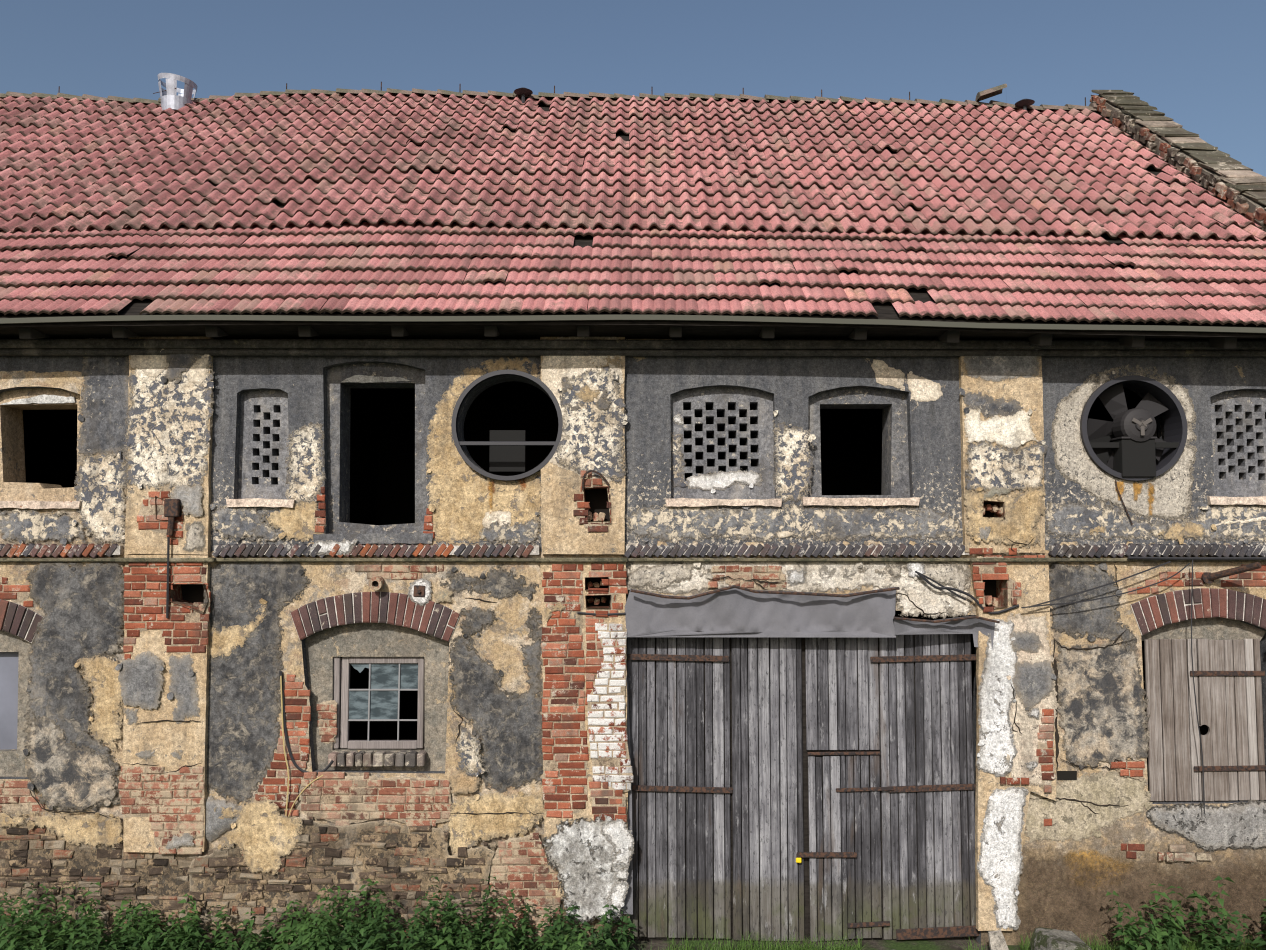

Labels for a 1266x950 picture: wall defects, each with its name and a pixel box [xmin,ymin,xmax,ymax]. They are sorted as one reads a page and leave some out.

corrosion [1116,482,1154,515]
flaking render [0,337,1266,947]
crack [1011,684,1022,734]
crack [1029,630,1142,814]